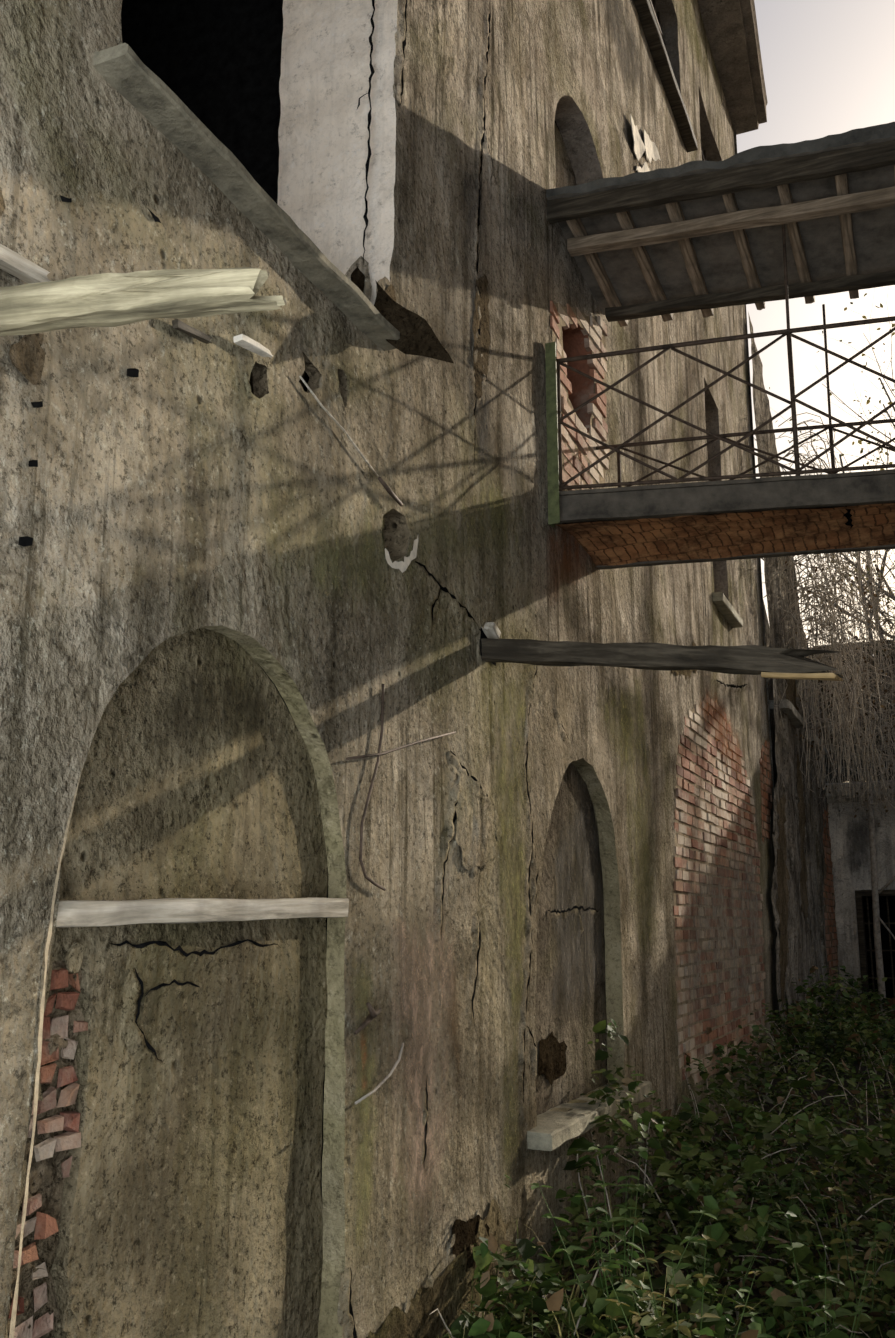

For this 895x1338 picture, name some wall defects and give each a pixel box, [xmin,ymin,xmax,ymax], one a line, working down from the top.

crack [357,0,407,265]
spalling [244,352,273,407]
spalling [294,341,352,419]
spalling [550,301,609,491]
spalling [382,508,418,573]
crack [434,665,600,1129]
spalling [668,670,792,1094]
spalling [821,801,838,1002]
spalling [7,763,105,1338]
crack [105,939,281,1076]
spalling [536,1025,568,1091]
spalling [353,1182,511,1338]